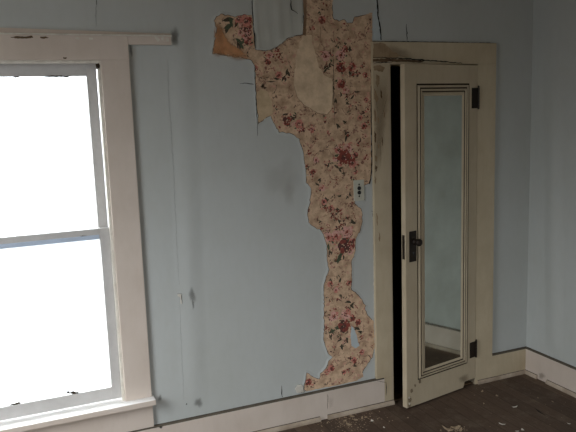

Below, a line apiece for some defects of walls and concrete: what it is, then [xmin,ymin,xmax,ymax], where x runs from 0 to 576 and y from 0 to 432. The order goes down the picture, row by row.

crack [372,0,418,42]
peeling [350,327,359,348]